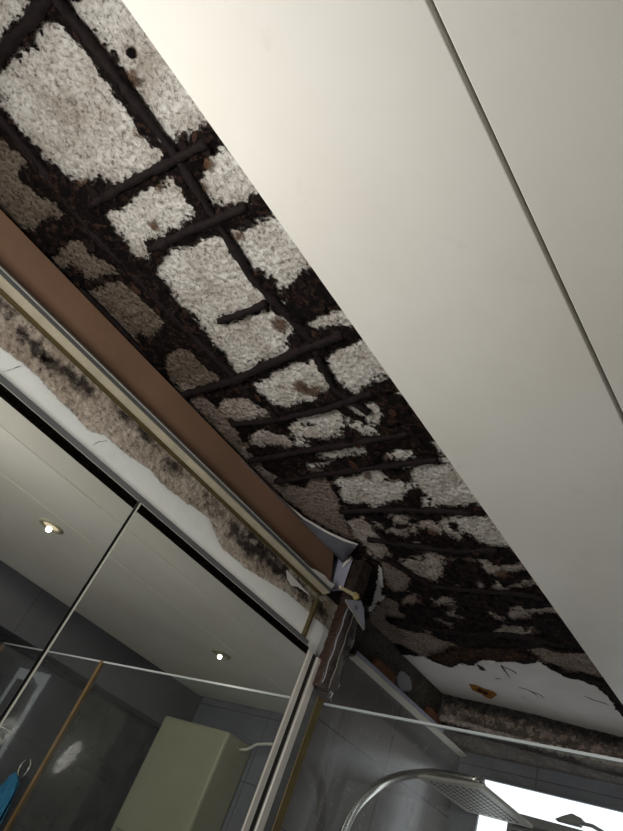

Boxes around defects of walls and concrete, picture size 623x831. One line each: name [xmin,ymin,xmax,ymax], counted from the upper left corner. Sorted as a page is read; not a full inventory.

rust [0,0,170,165]
spalling [0,0,344,446]
spalling [304,309,353,331]
water stain [16,327,94,397]
water stain [117,410,158,446]
rust [0,94,623,717]
peeling [0,347,329,658]
peeling [228,338,623,737]
spalling [439,703,623,767]
water stain [440,722,623,777]
water stain [443,694,623,748]